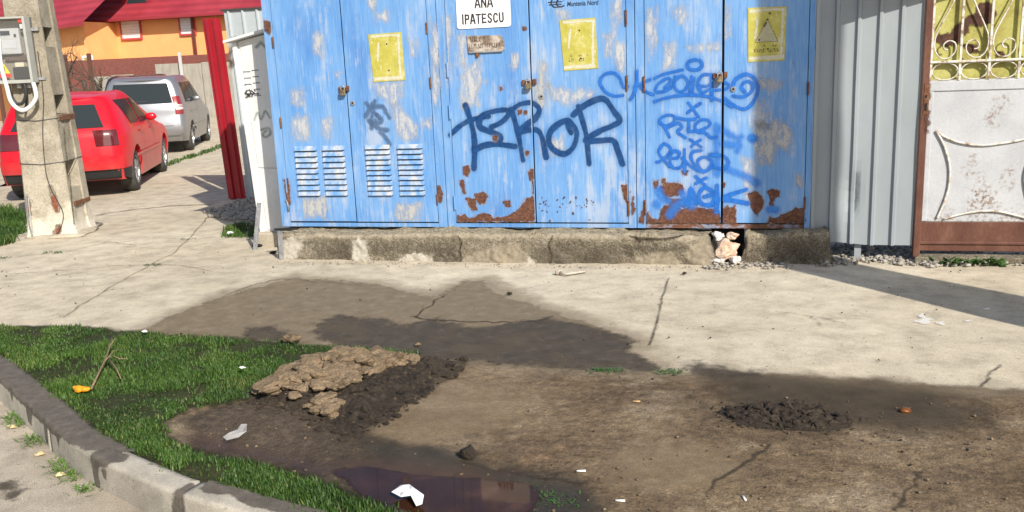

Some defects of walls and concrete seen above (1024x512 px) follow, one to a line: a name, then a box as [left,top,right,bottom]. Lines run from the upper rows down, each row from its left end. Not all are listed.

corrosion [457,165,594,222]
corrosion [621,170,737,224]
corrosion [748,189,806,224]
damp [143,276,671,372]
crack [411,295,551,323]
crack [649,278,669,345]